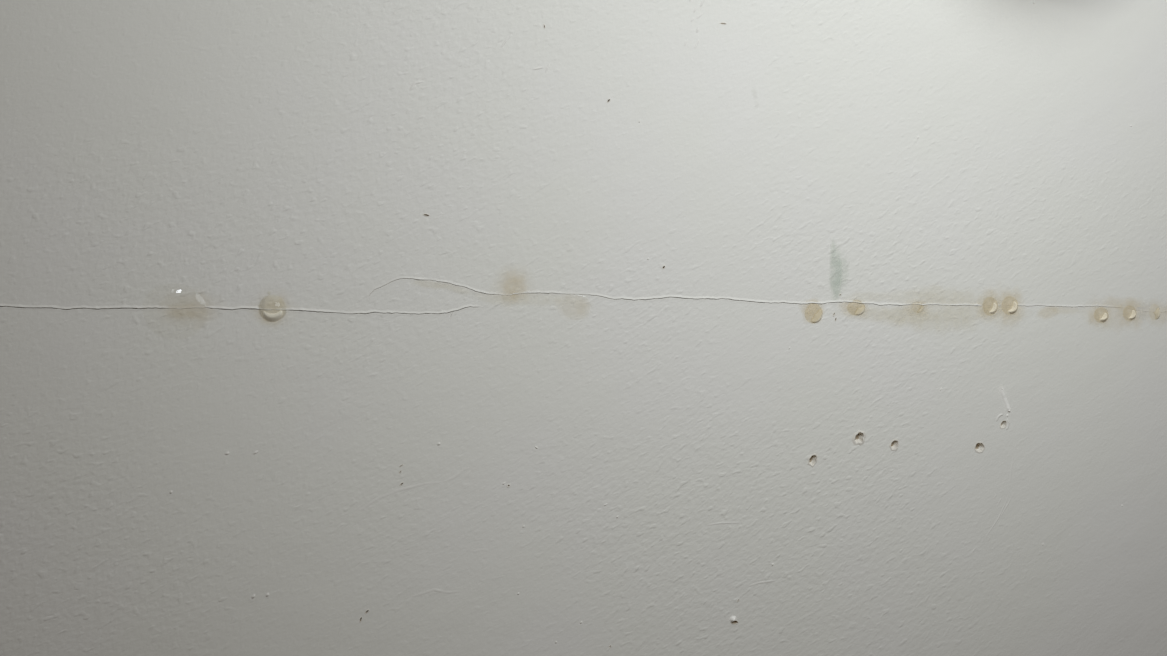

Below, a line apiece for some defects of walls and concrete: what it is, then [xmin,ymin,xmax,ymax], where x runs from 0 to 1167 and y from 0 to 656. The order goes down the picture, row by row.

crack [0,276,1167,320]